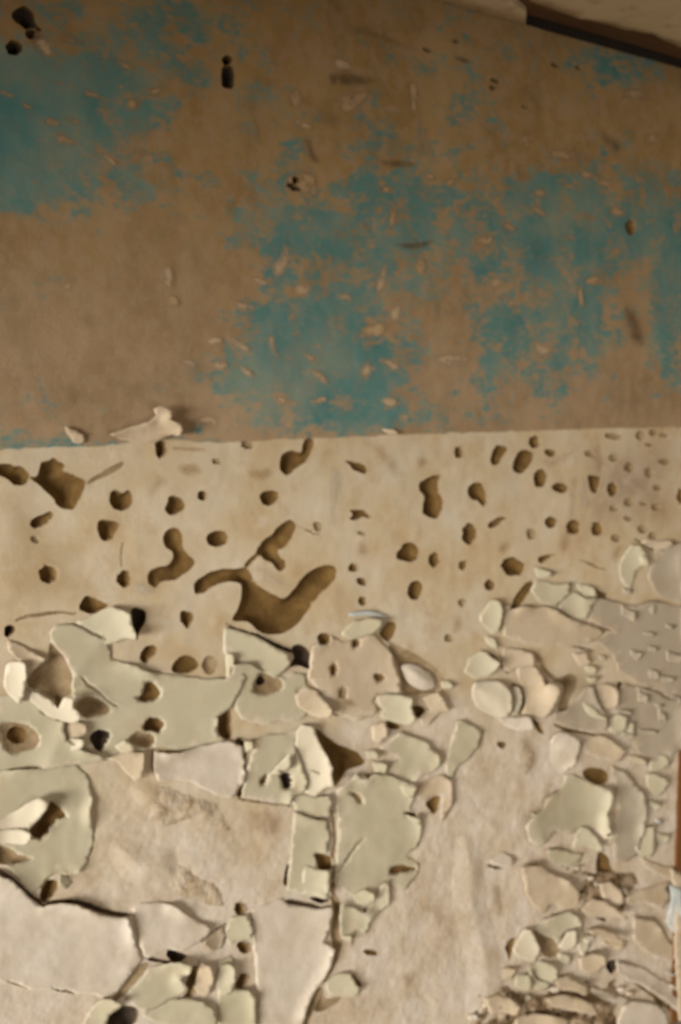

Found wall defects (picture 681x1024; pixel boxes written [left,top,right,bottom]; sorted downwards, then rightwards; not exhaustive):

spalling [0,458,124,543]
spalling [490,435,569,493]
crack [16,611,103,638]
crack [226,623,292,653]
peeling [0,490,483,956]
peeling [462,451,681,912]
crack [554,723,596,736]
crack [0,869,131,916]
crack [112,957,172,1001]
peeling [83,864,257,1024]
crack [286,809,364,1024]
spalling [471,911,625,1024]